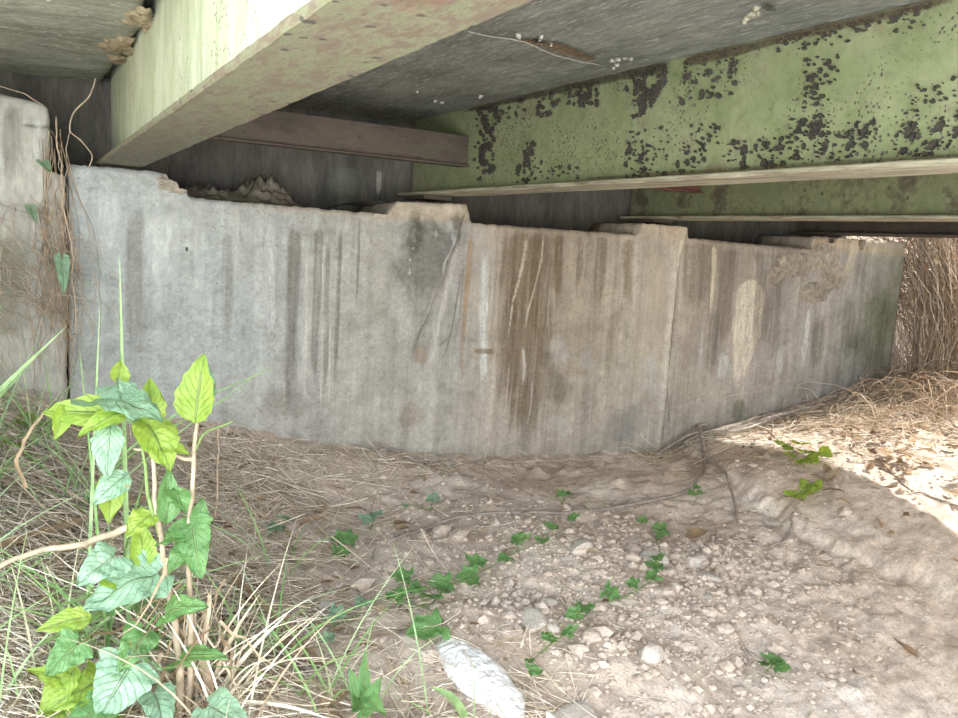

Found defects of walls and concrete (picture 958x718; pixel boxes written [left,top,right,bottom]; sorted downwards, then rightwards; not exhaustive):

crack [468,31,598,65]
spalling [609,57,634,70]
peeling [623,6,930,178]
peeling [893,76,958,157]
flaking render [766,243,848,304]
water stain [480,258,488,375]
water stain [502,236,546,417]
water stain [732,279,764,383]
water stain [801,311,810,360]